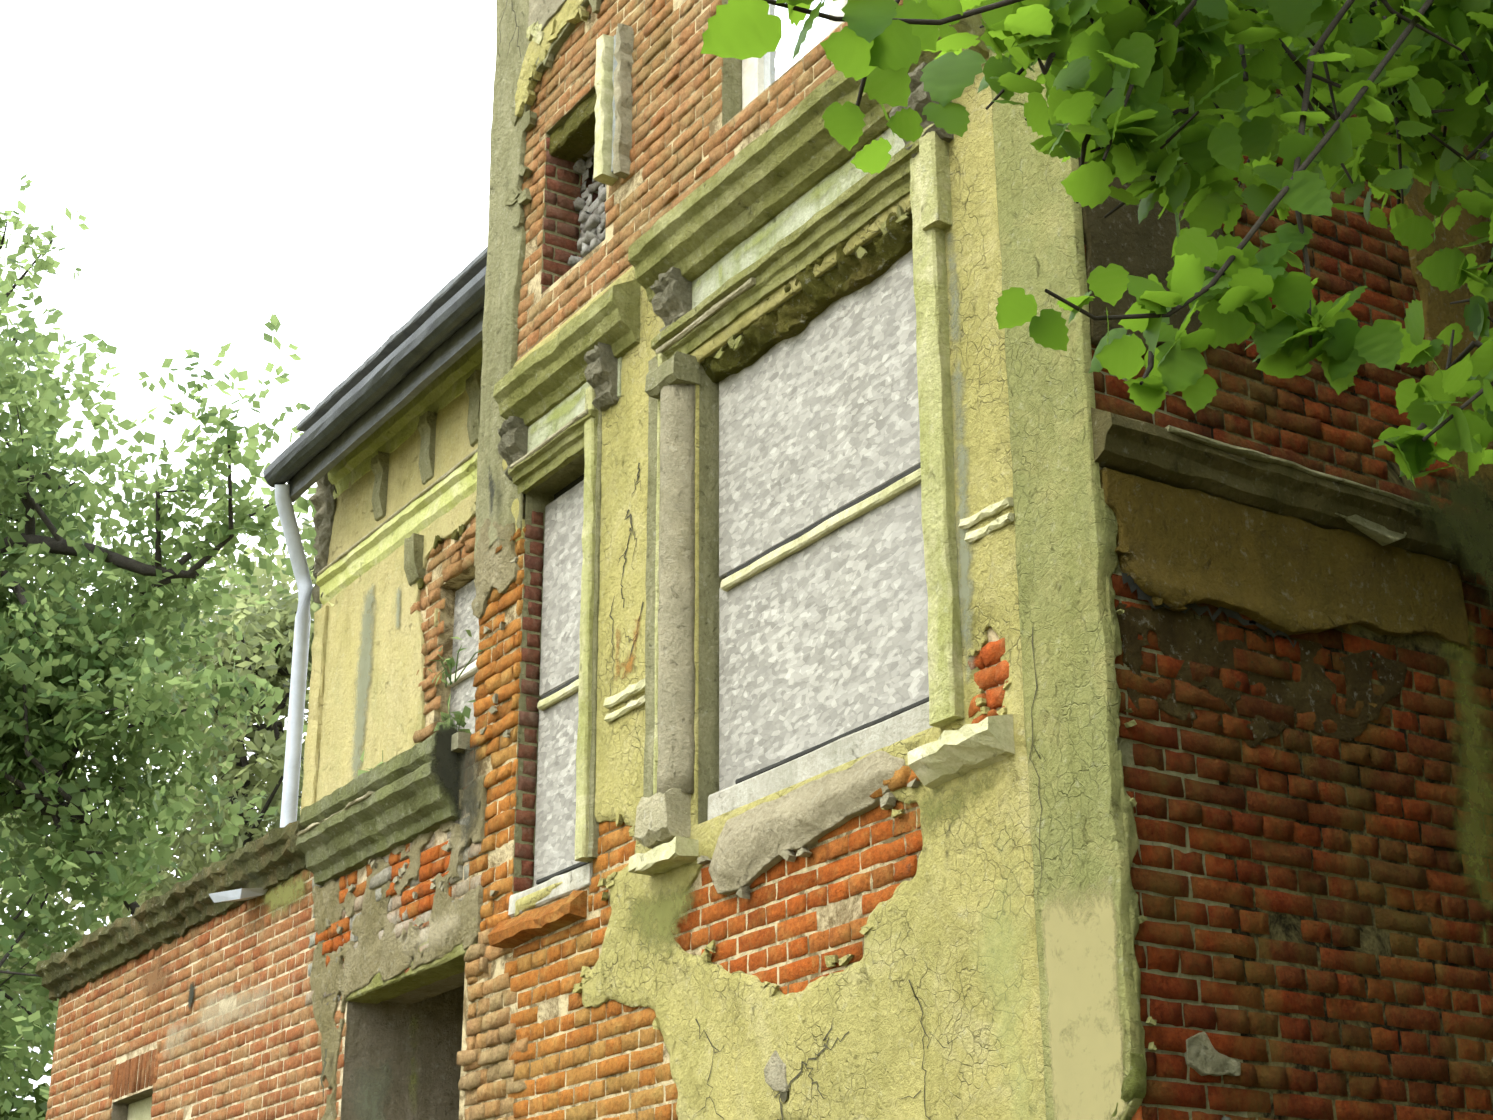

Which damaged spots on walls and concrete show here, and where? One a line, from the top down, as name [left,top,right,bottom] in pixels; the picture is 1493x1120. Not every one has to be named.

flaking render [504,0,848,362]
flaking render [881,205,910,236]
flaking render [315,502,678,1120]
crack [609,463,644,695]
flaking render [672,766,923,998]
flaking render [967,638,1011,724]
flaking render [1100,467,1471,1120]
crack [695,1019,728,1120]
crack [770,1021,849,1120]